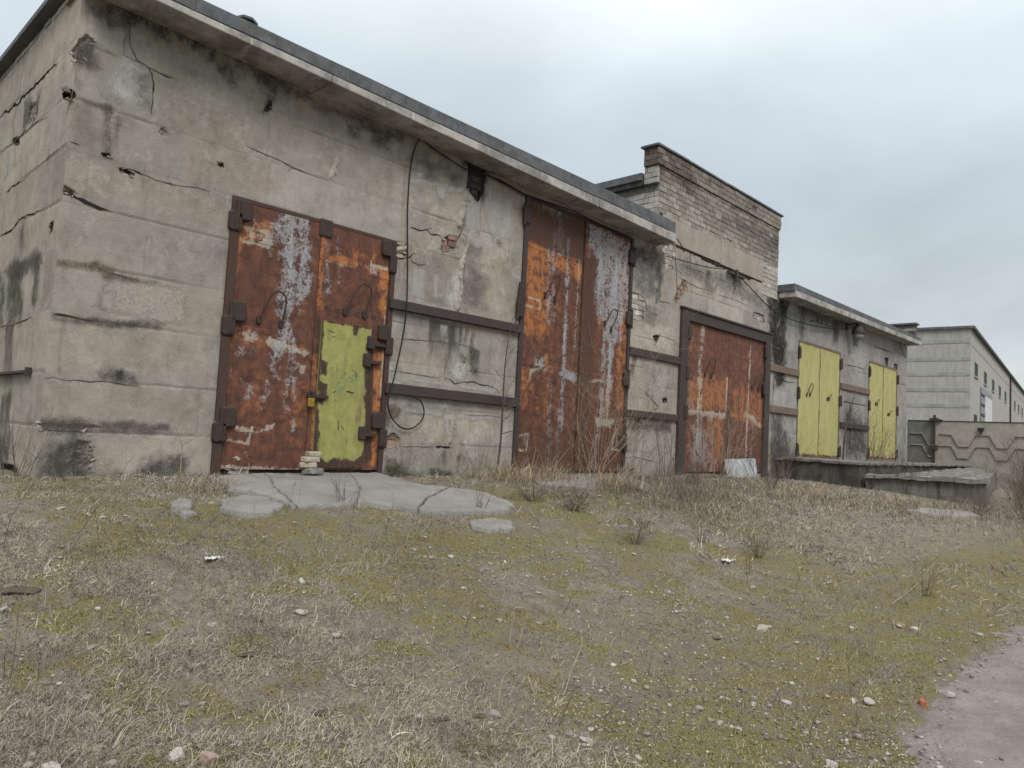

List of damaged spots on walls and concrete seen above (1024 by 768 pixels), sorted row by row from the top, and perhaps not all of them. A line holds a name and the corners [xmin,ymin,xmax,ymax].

spalling [68,33,97,63]
crack [117,13,173,115]
crack [0,64,57,151]
spalling [61,85,76,102]
crack [252,148,318,178]
crack [128,168,208,191]
crack [63,190,112,212]
crack [398,206,479,307]
spalling [440,234,457,253]
damp [0,251,42,362]
damp [40,418,169,478]